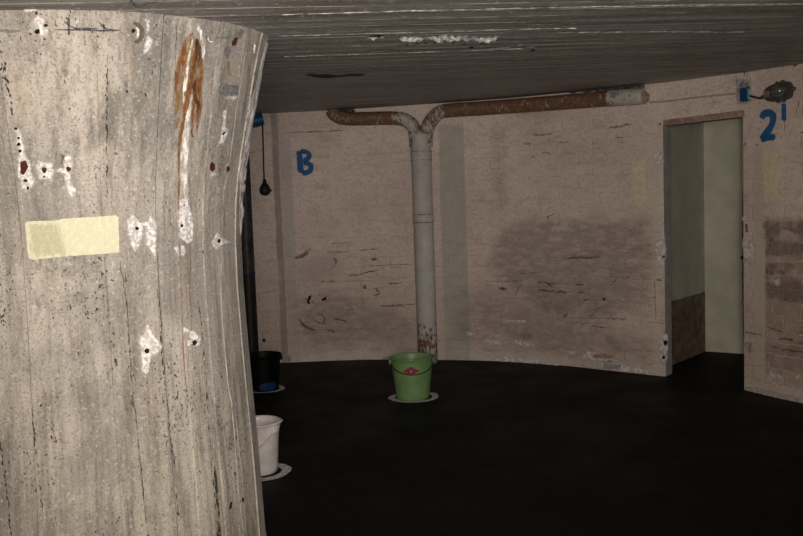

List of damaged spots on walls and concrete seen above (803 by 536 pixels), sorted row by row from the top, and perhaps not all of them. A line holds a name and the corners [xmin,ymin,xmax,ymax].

rust [174,26,205,154]
spalling [399,34,535,51]